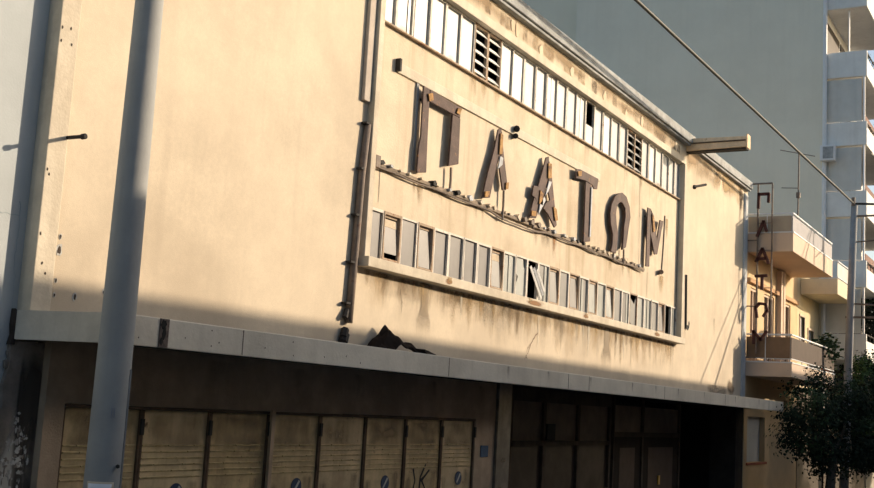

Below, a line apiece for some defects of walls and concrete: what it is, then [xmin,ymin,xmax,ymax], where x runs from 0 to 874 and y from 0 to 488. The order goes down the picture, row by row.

damp [420,284,429,319]
damp [442,289,528,322]
spalling [3,308,17,369]
damp [562,319,643,354]
peeling [0,361,42,488]